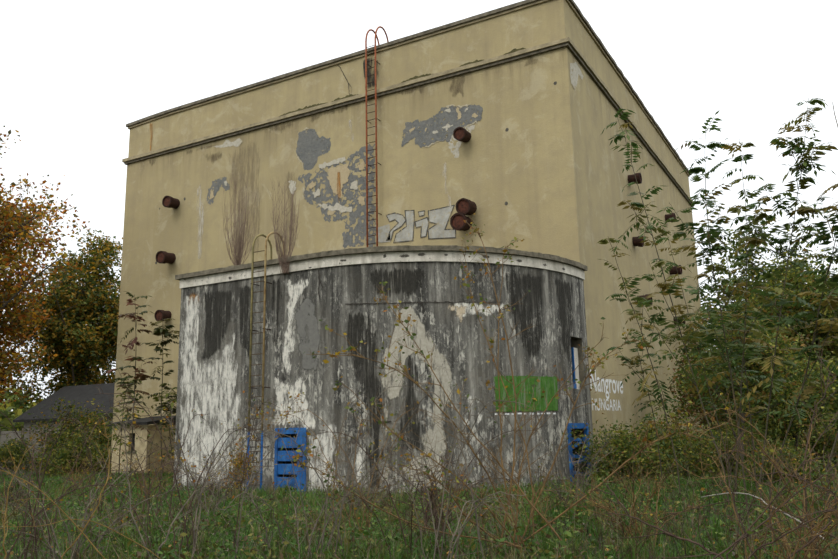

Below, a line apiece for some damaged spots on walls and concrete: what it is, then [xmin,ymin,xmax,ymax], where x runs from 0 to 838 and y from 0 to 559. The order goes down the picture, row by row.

peeling [401,104,483,158]
peeling [206,177,229,205]
peeling [288,127,376,249]
leakage [202,286,253,359]
leakage [272,280,280,345]
leakage [370,268,424,296]
leakage [506,272,545,357]
leakage [555,278,573,361]
leakage [347,312,384,488]
leakage [400,356,420,450]